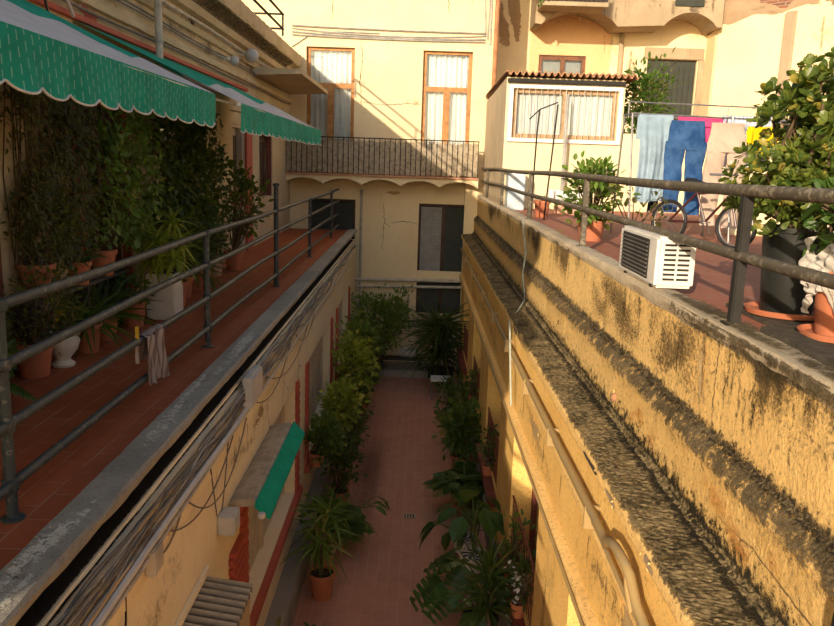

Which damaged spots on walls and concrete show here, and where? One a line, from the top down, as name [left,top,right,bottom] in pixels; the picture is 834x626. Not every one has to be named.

flaking render [750,0,794,14]
leakage [474,204,834,605]